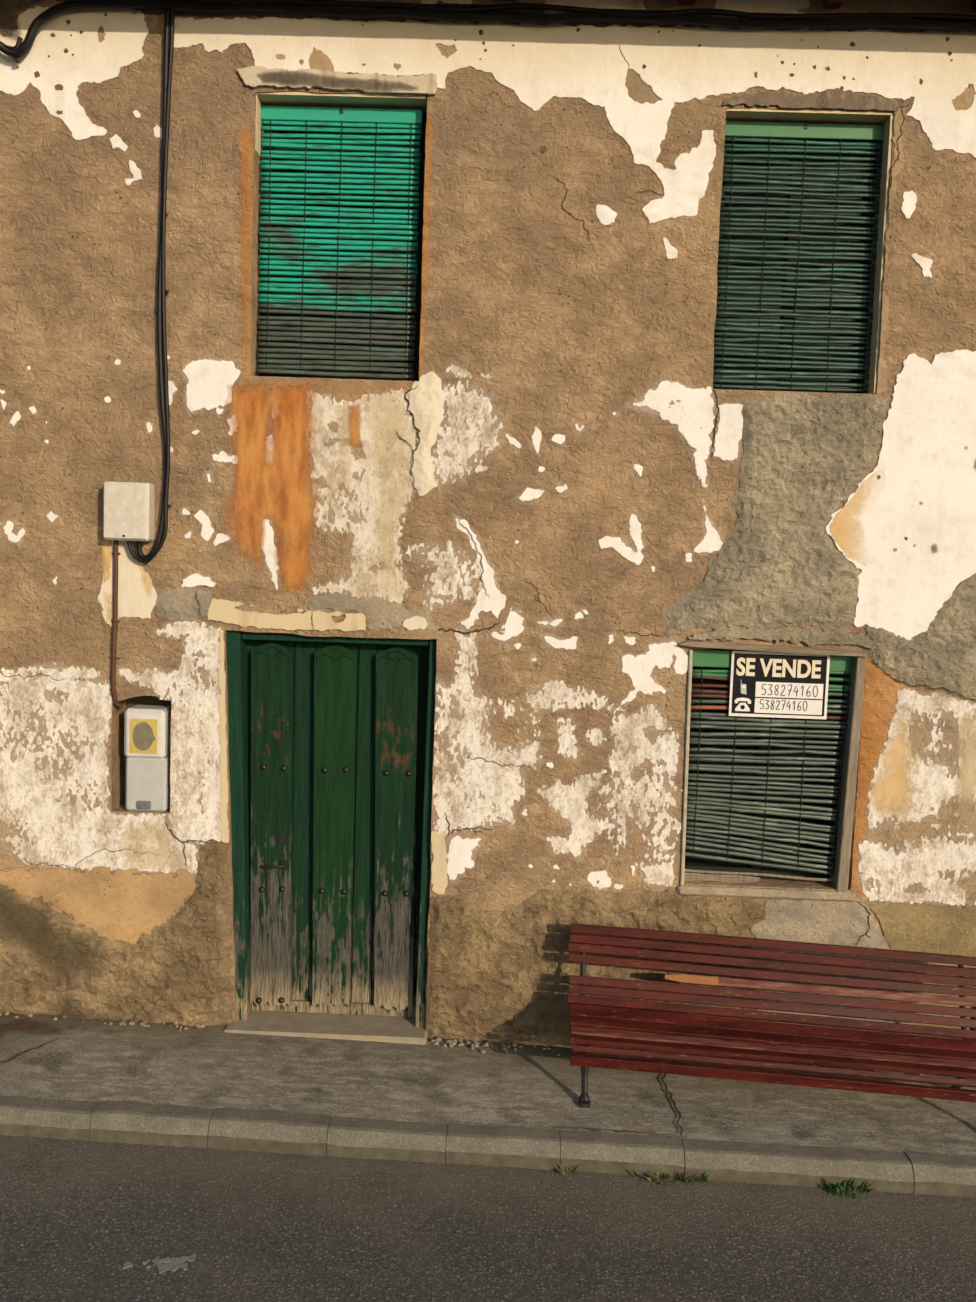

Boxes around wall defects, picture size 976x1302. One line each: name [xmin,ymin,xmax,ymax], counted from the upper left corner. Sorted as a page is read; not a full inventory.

peeling [0,6,149,186]
peeling [174,0,976,225]
flaking render [168,125,254,436]
flaking render [419,116,433,377]
peeling [663,237,678,259]
peeling [911,253,933,278]
corrosion [229,384,314,590]
peeling [432,364,584,490]
peeling [825,349,976,640]
peeling [0,380,766,1057]
peeling [851,659,976,1040]
crack [563,1060,683,1136]